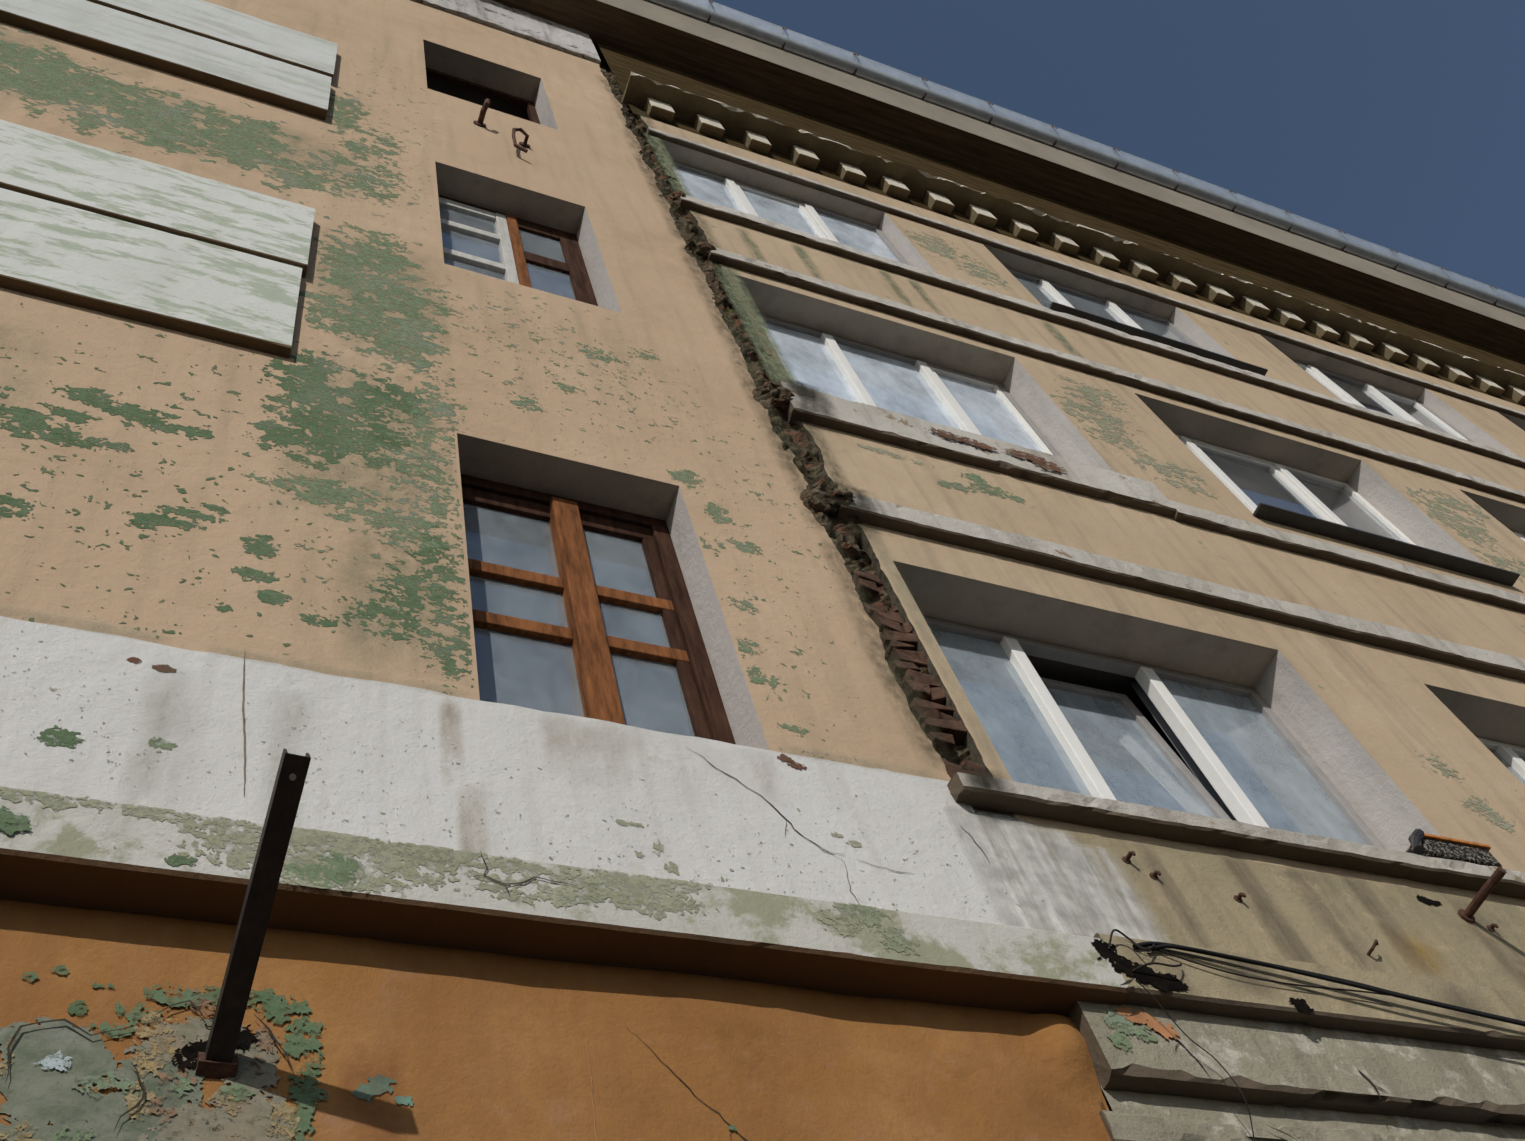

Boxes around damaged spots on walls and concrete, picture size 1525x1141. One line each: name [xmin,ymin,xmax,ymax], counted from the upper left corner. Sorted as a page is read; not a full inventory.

peeling [0,24,985,778]
peeling [925,426,1068,472]
peeling [0,786,263,870]
peeling [262,697,920,955]
crack [687,747,914,905]
flaking render [0,982,327,1141]
crack [626,1026,748,1141]
peeling [1102,1004,1181,1053]
spalling [1289,998,1314,1015]